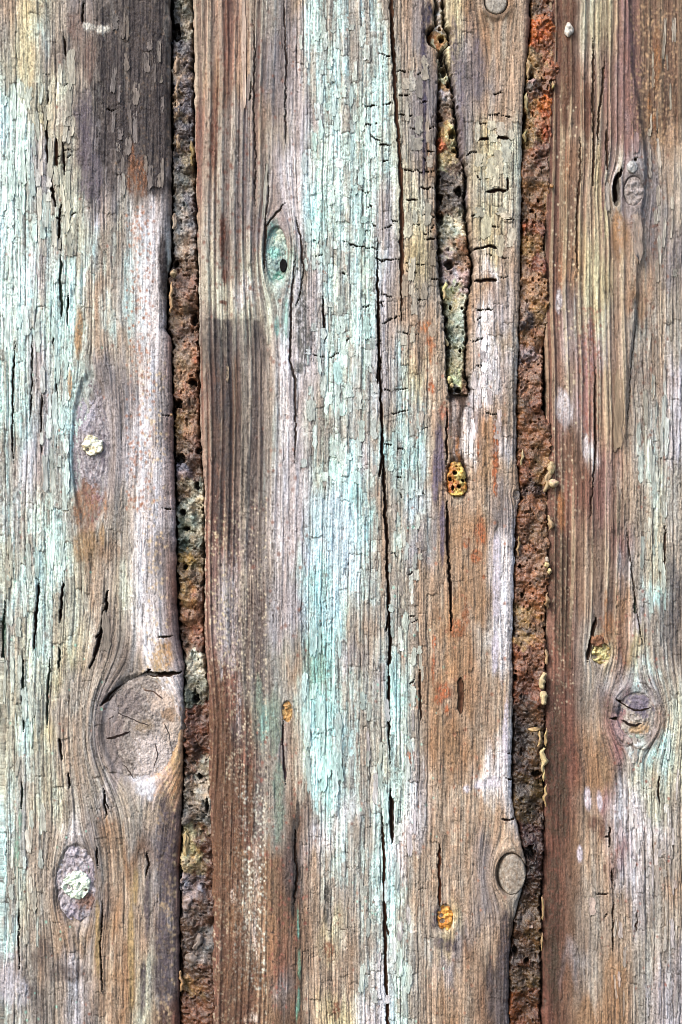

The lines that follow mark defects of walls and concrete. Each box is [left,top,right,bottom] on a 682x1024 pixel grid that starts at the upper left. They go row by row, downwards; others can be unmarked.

peeling [110,10,140,196]
peeling [299,17,376,221]
peeling [401,55,433,168]
peeling [1,48,76,510]
peeling [300,294,424,499]
crack [344,0,452,763]
peeling [2,656,41,777]
crack [89,590,109,669]
peeling [302,617,344,797]
peeling [358,504,424,1017]
peeling [2,802,46,948]
crack [382,790,394,1024]